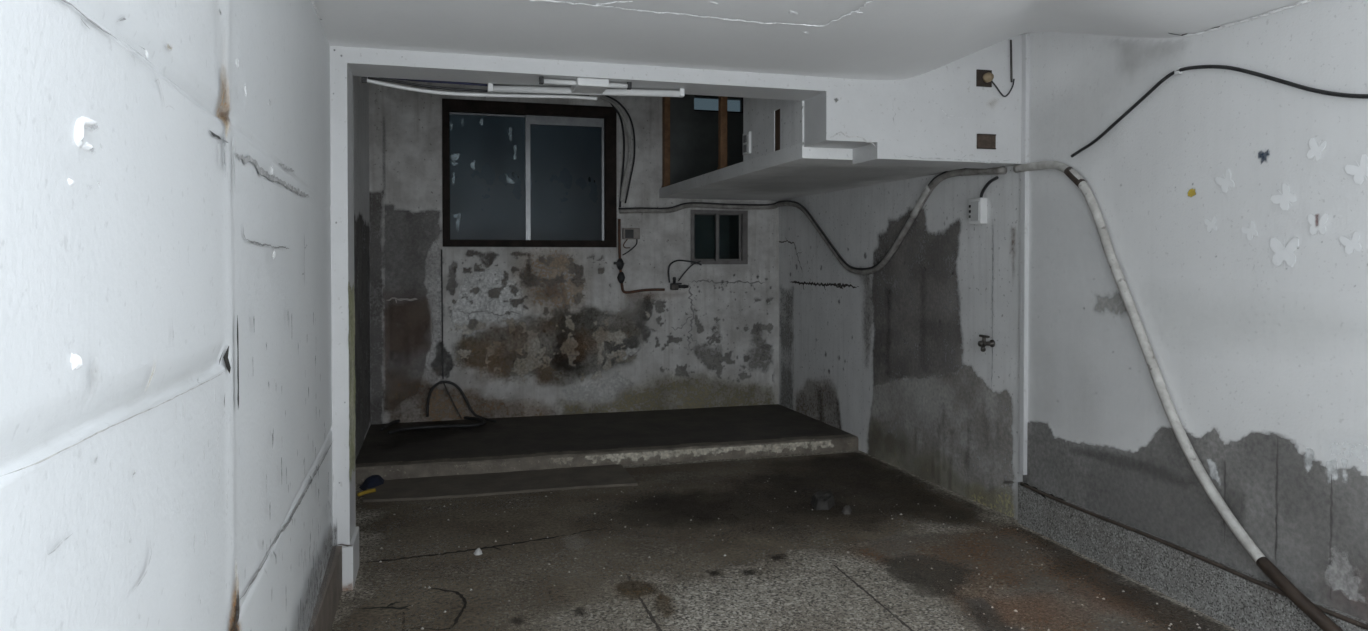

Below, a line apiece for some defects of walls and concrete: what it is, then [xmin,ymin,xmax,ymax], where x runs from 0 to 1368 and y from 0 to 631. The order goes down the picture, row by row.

crack [62,0,126,39]
corrosion [217,82,230,121]
peeling [348,192,833,478]
peeling [865,209,1368,622]
corrosion [230,590,239,631]